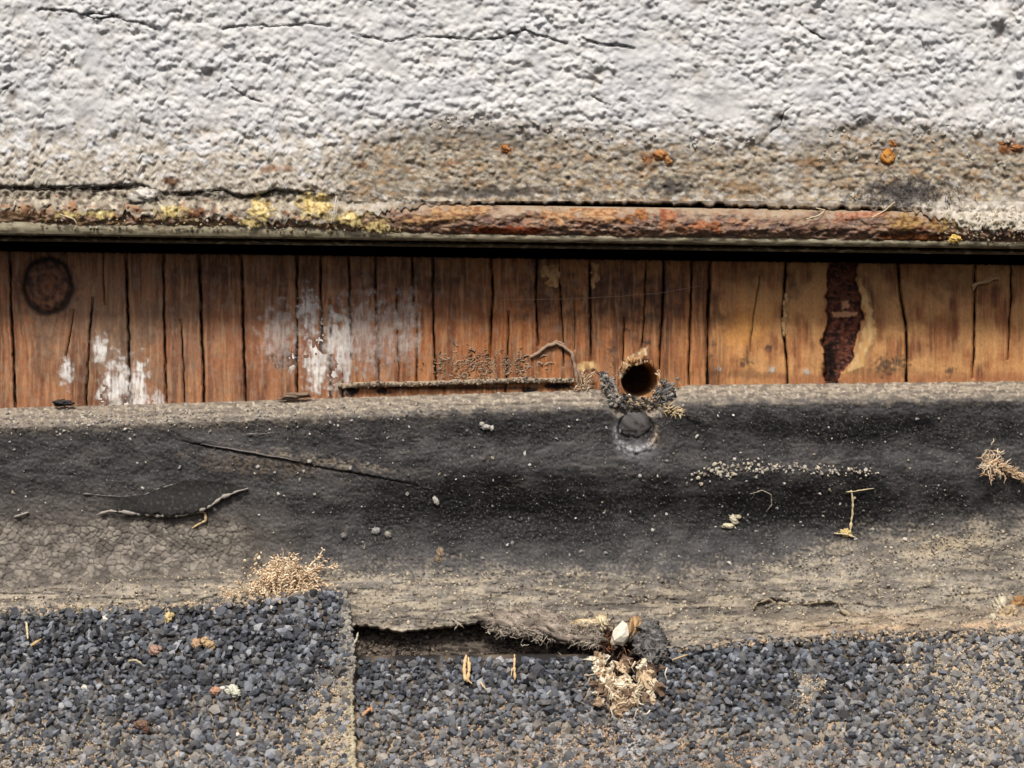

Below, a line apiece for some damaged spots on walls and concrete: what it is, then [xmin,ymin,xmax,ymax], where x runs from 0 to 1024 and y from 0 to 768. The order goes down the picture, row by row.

crack [39,9,147,26]
crack [355,29,631,48]
rust [642,149,673,166]
rust [880,139,898,166]
rust [998,141,1023,154]
crack [0,184,145,192]
crack [180,189,419,200]
rust [184,208,205,217]
rust [620,209,648,224]
rust [455,224,544,235]
rust [877,233,951,242]
crack [180,440,410,484]